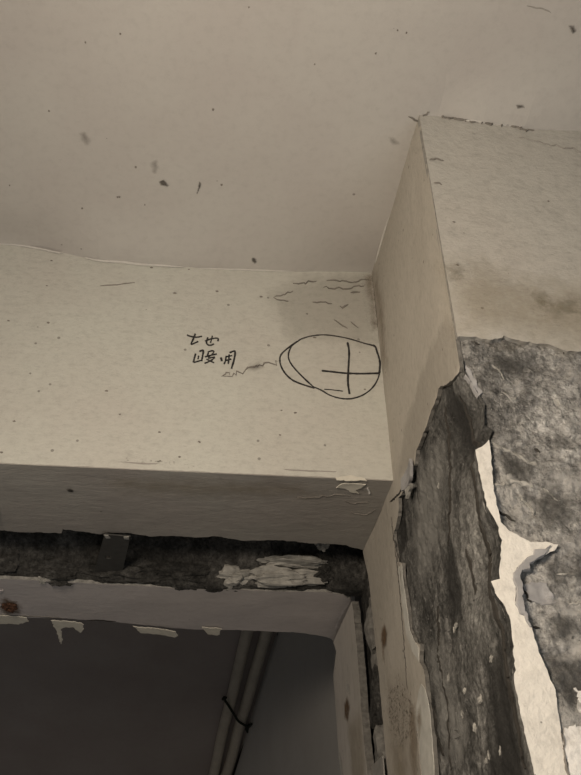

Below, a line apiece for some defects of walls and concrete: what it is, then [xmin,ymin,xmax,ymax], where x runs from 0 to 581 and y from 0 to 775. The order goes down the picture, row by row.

crack [222,360,277,377]
peeling [336,475,370,494]
flaking render [397,339,581,775]
peeling [51,620,84,644]
peeling [133,626,178,638]